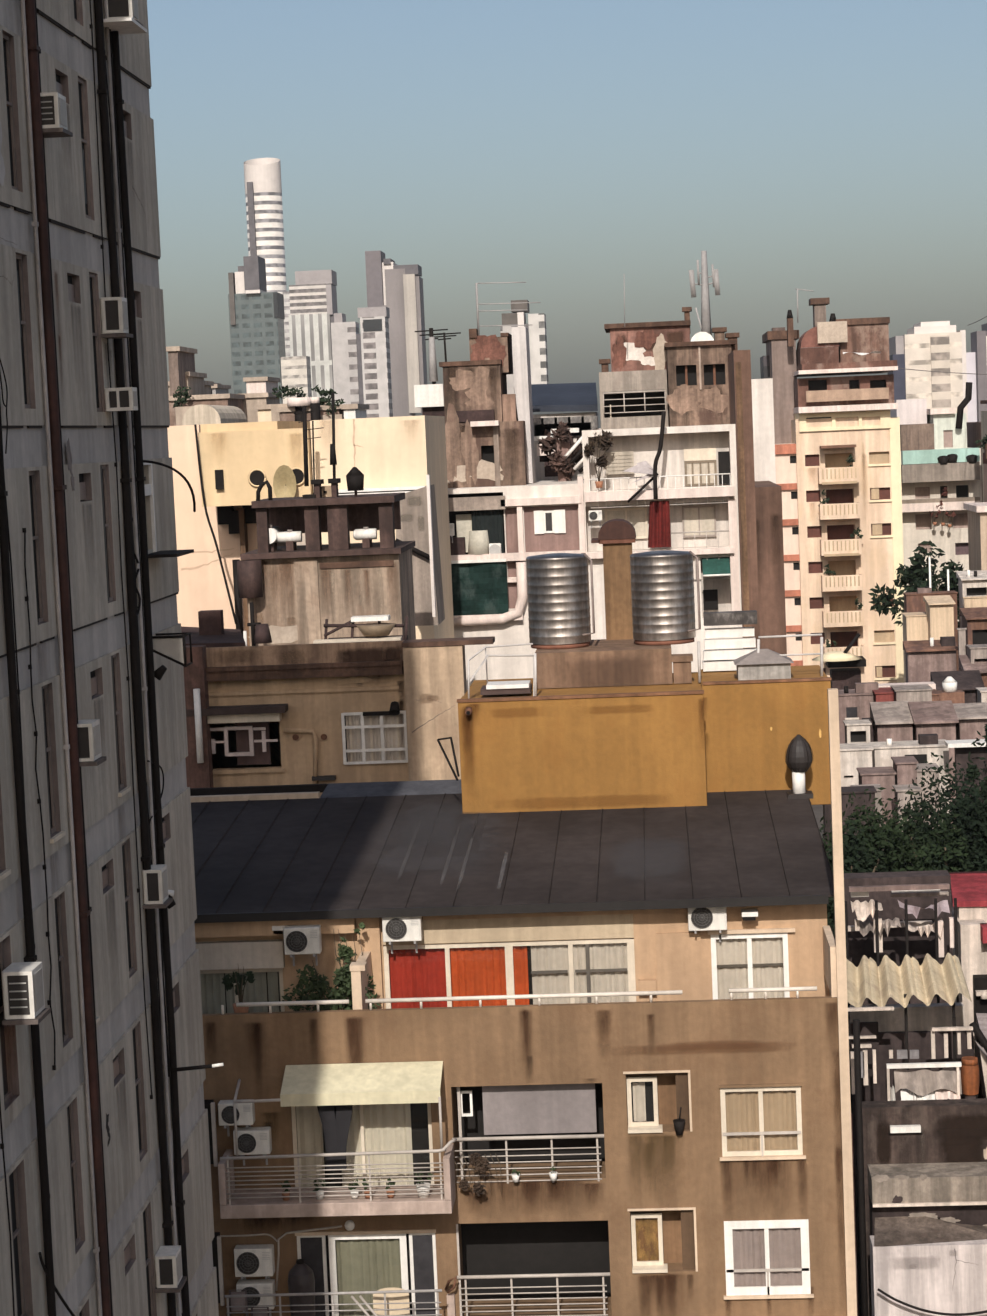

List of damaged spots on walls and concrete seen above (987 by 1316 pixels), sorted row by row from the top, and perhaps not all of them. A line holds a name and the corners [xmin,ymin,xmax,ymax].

peeling [612,328,668,371]
spalling [666,384,729,415]